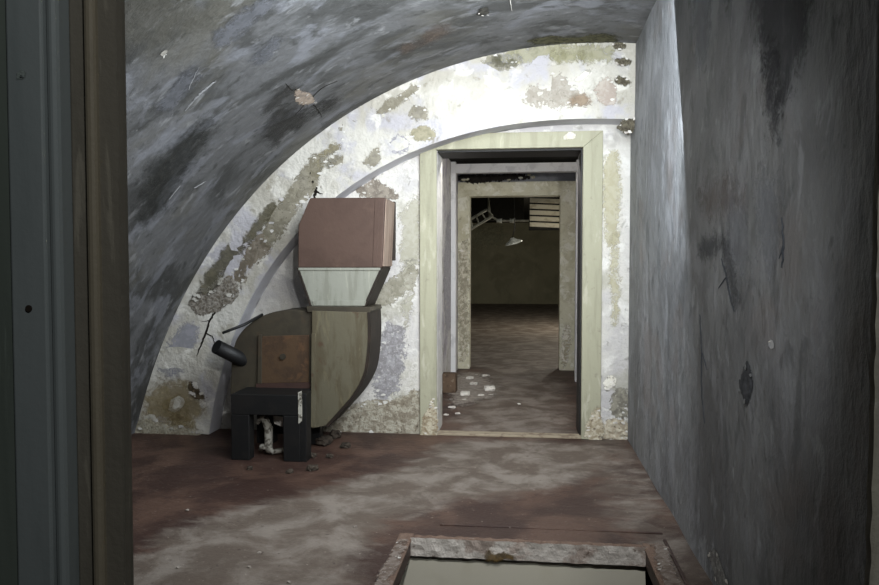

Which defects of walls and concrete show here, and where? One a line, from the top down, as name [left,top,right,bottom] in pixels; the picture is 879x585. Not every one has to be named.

flaking render [286,81,337,117]
peeling [481,54,517,71]
peeling [522,42,632,110]
peeling [188,126,349,316]
crack [196,312,216,356]
peeling [323,321,460,435]
flaking render [584,375,628,440]